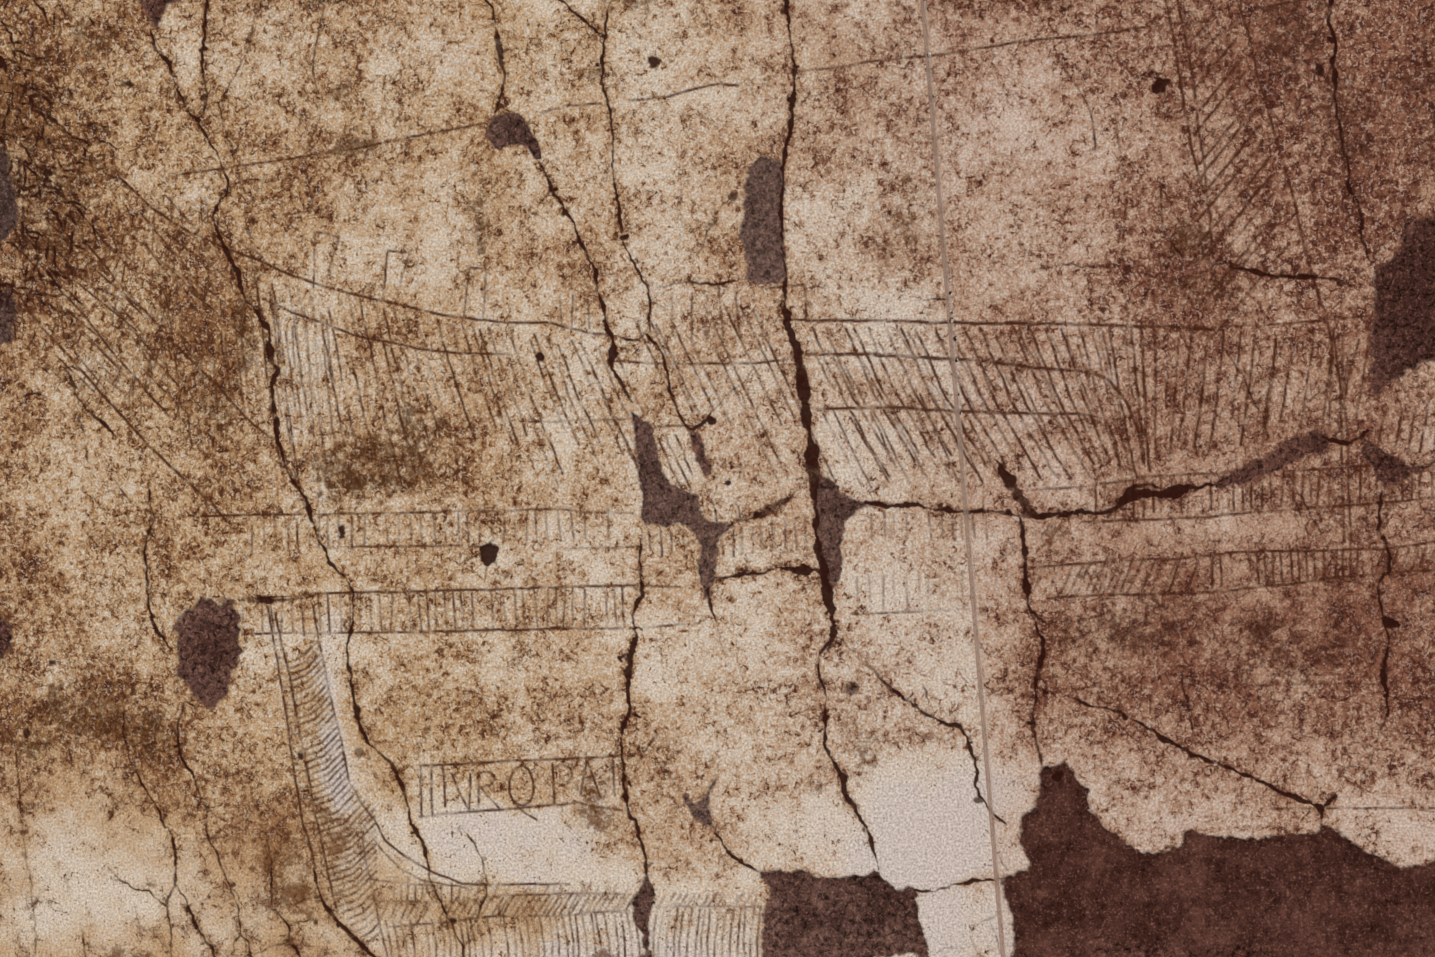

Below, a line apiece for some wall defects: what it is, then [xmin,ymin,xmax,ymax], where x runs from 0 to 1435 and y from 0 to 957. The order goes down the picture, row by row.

flaking render [133,0,180,34]
flaking render [483,108,544,163]
flaking render [725,153,790,289]
flaking render [1364,210,1435,404]
crack [0,0,498,957]
flaking render [627,406,738,602]
crack [454,0,1435,905]
flaking render [0,610,16,662]
flaking render [170,588,317,713]
flaking render [629,871,659,957]
flaking render [756,866,932,957]
flaking render [999,758,1435,957]